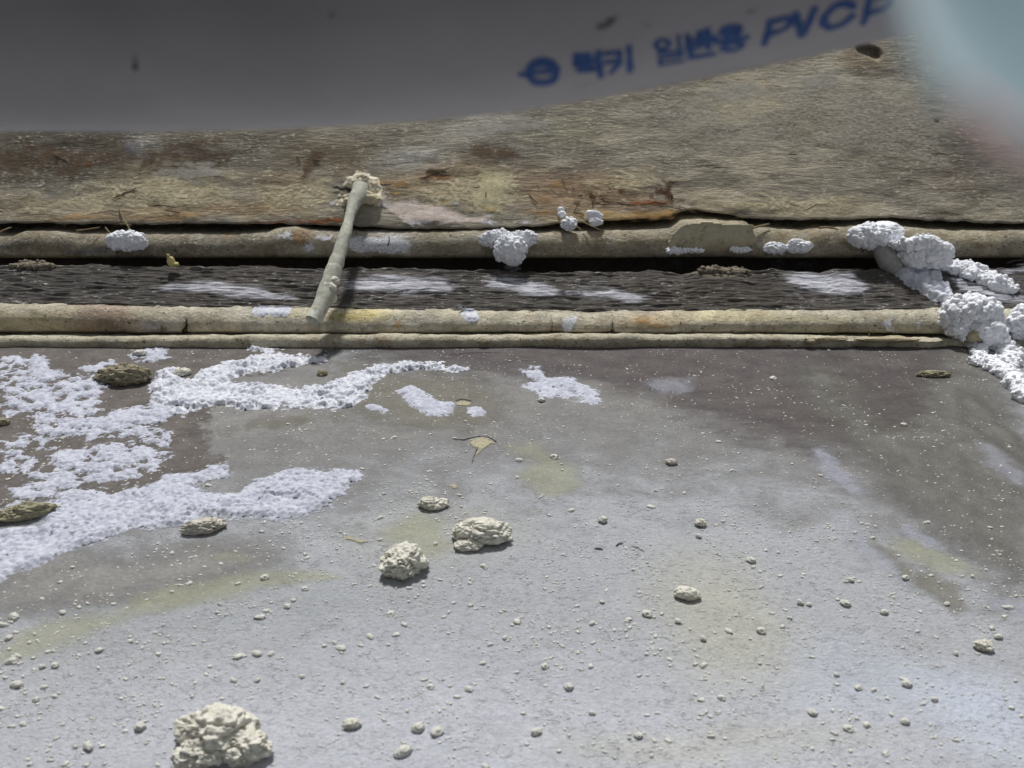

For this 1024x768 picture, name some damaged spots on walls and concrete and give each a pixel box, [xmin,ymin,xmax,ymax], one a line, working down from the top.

water stain [258,116,556,254]
corrosion [603,179,675,218]
water stain [0,345,1024,612]